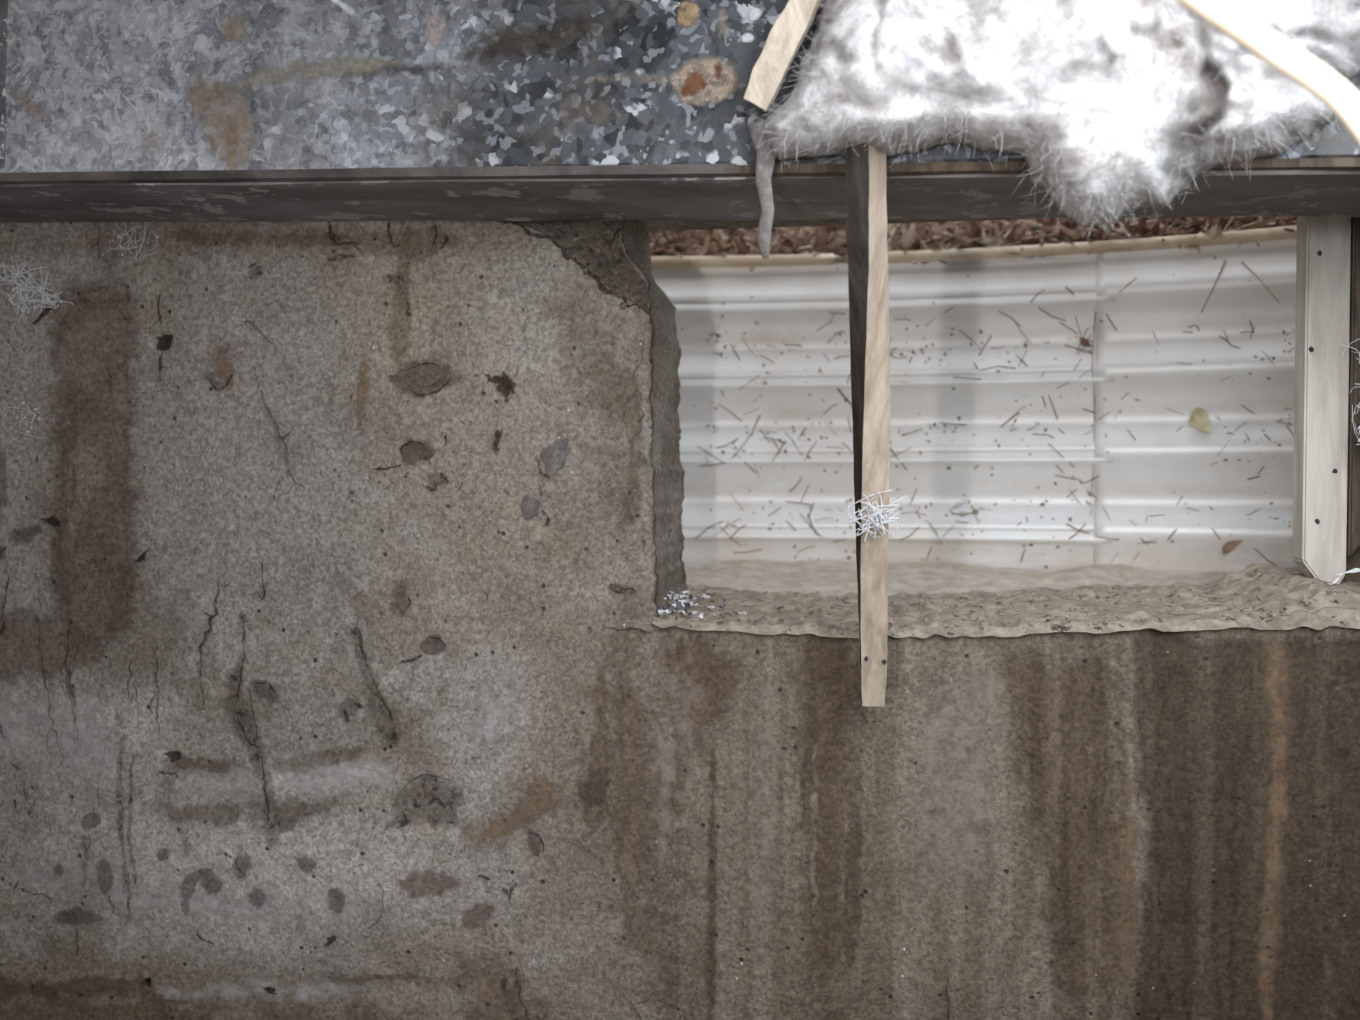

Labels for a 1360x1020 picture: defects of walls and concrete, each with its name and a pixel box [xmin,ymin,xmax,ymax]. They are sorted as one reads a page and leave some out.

rust [661,58,736,103]
spalling [498,220,649,312]
crack [0,724,31,815]
crack [0,559,79,772]
water stain [0,282,278,923]
crack [198,560,266,709]
water stain [584,641,738,1019]
water stain [795,635,864,979]
water stain [1010,629,1360,1020]